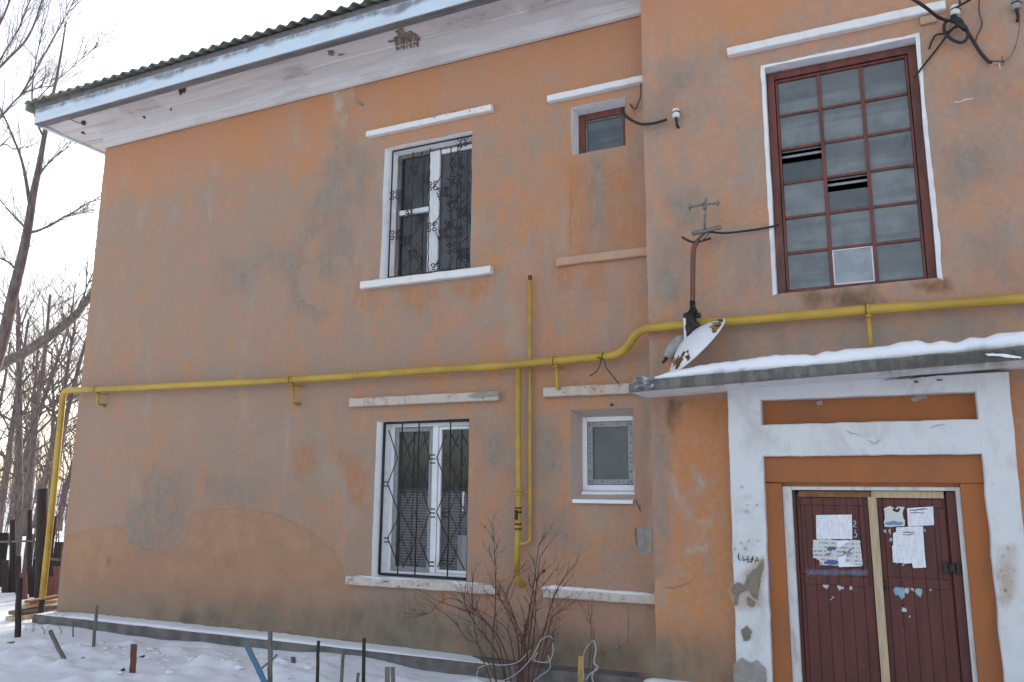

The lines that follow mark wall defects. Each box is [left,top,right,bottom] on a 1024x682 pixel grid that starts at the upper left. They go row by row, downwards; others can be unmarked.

damp [807,291,870,305]
flaking render [635,527,652,556]
peeling [731,559,764,607]
peeling [741,626,752,641]
peeling [733,658,767,682]